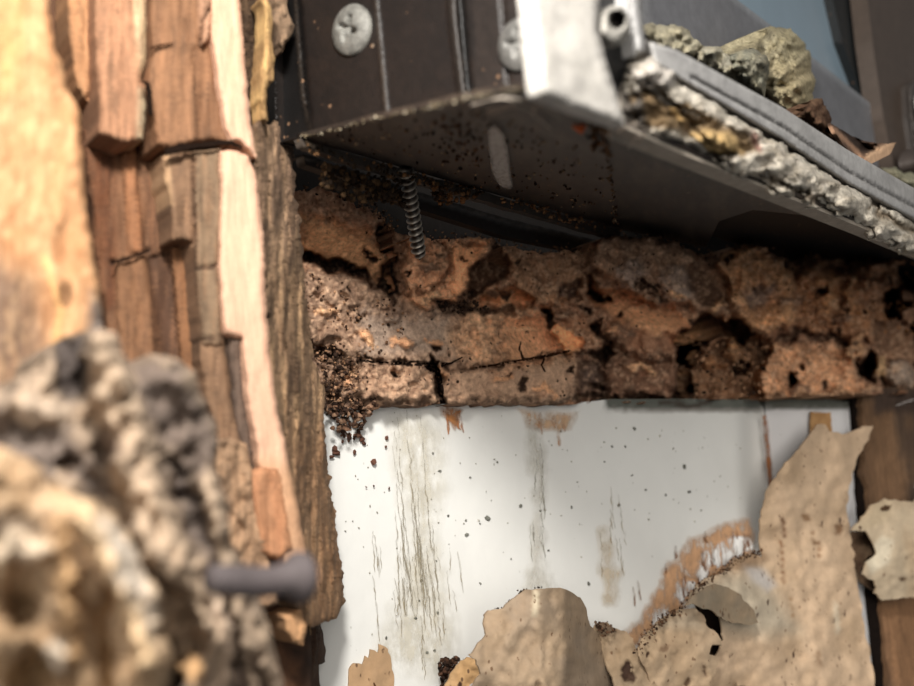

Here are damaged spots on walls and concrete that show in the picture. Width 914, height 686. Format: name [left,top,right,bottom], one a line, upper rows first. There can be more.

crack [142,81,153,116]
crack [164,139,243,156]
crack [359,341,570,403]
water stain [391,473,457,679]
peeling [593,412,875,686]
peeling [444,657,479,686]